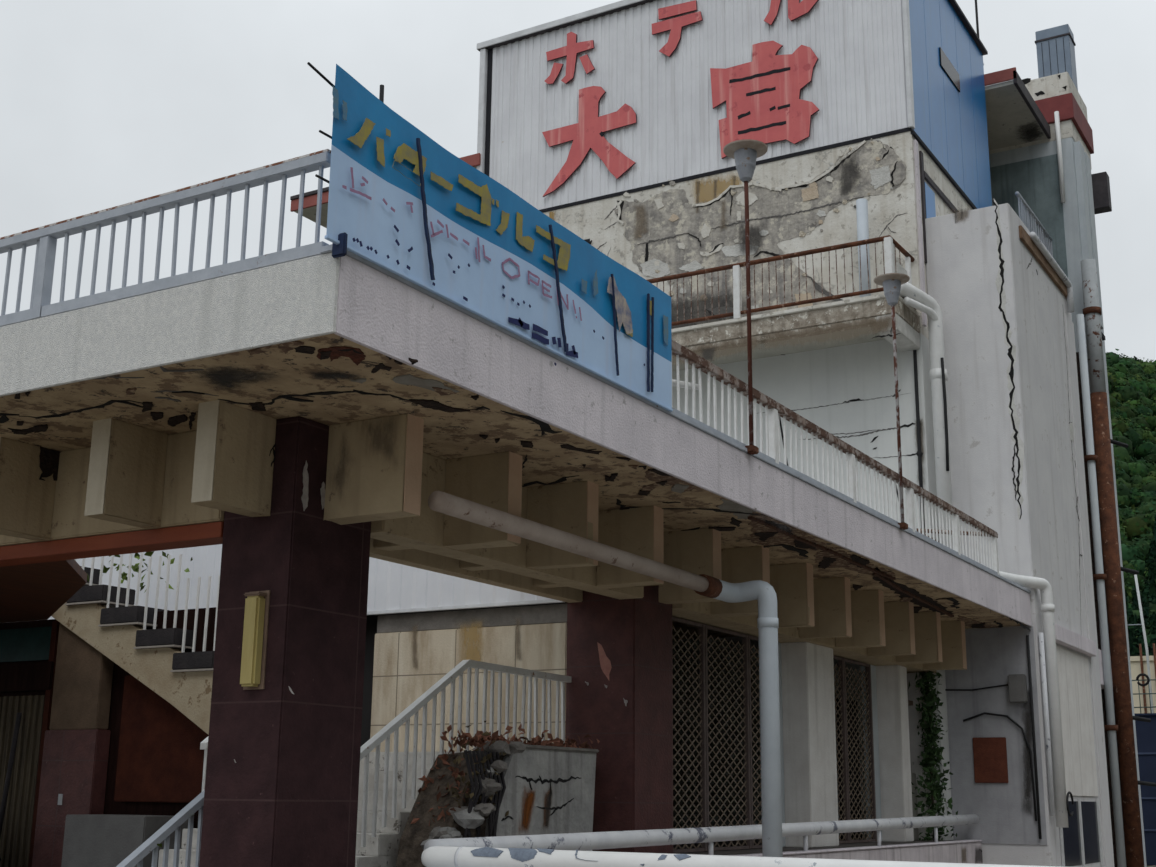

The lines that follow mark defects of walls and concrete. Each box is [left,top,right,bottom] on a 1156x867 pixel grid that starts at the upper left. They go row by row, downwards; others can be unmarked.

peeling [615,138,907,329]
spalling [0,413,65,434]
spalling [301,461,325,511]
crack [13,366,720,531]
crack [763,389,903,413]
crack [803,423,916,458]
crack [993,198,1038,519]
rust [1076,352,1101,650]
crack [501,776,581,821]
rust [1101,689,1118,867]